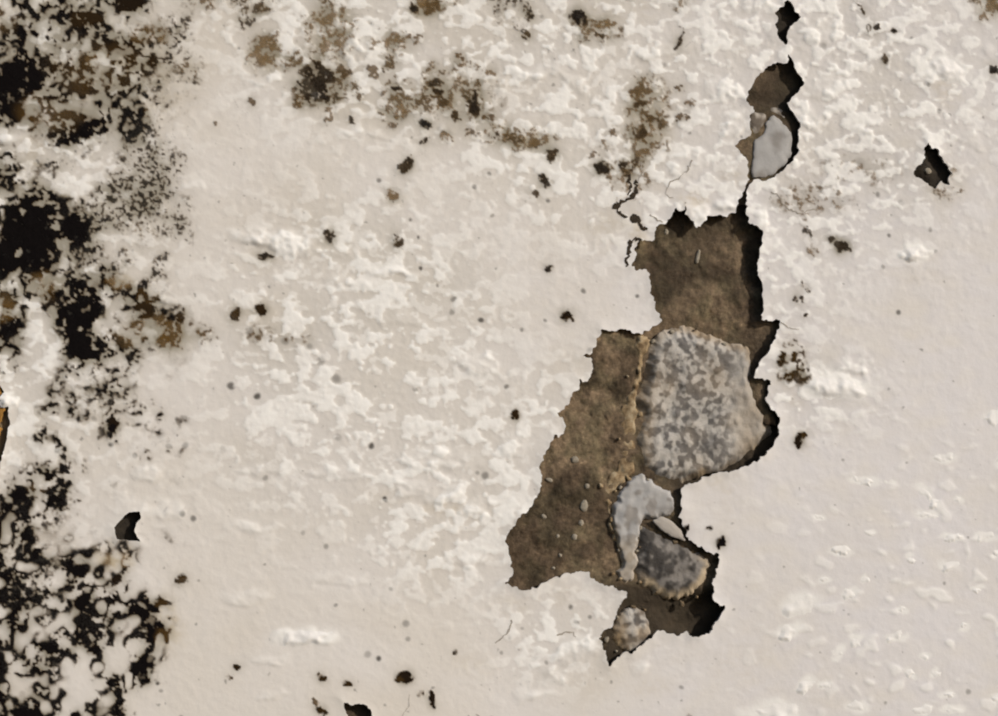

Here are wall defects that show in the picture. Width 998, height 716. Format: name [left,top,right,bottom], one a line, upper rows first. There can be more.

mould [569,10,623,41]
mould [254,35,361,121]
mould [397,157,414,173]
mould [366,33,559,161]
mould [591,77,694,190]
peeling [914,144,951,189]
mould [0,0,211,442]
peeling [505,1,804,666]
peeling [0,387,10,461]
hole [114,512,141,541]
mould [0,427,172,716]
peeling [344,703,372,716]